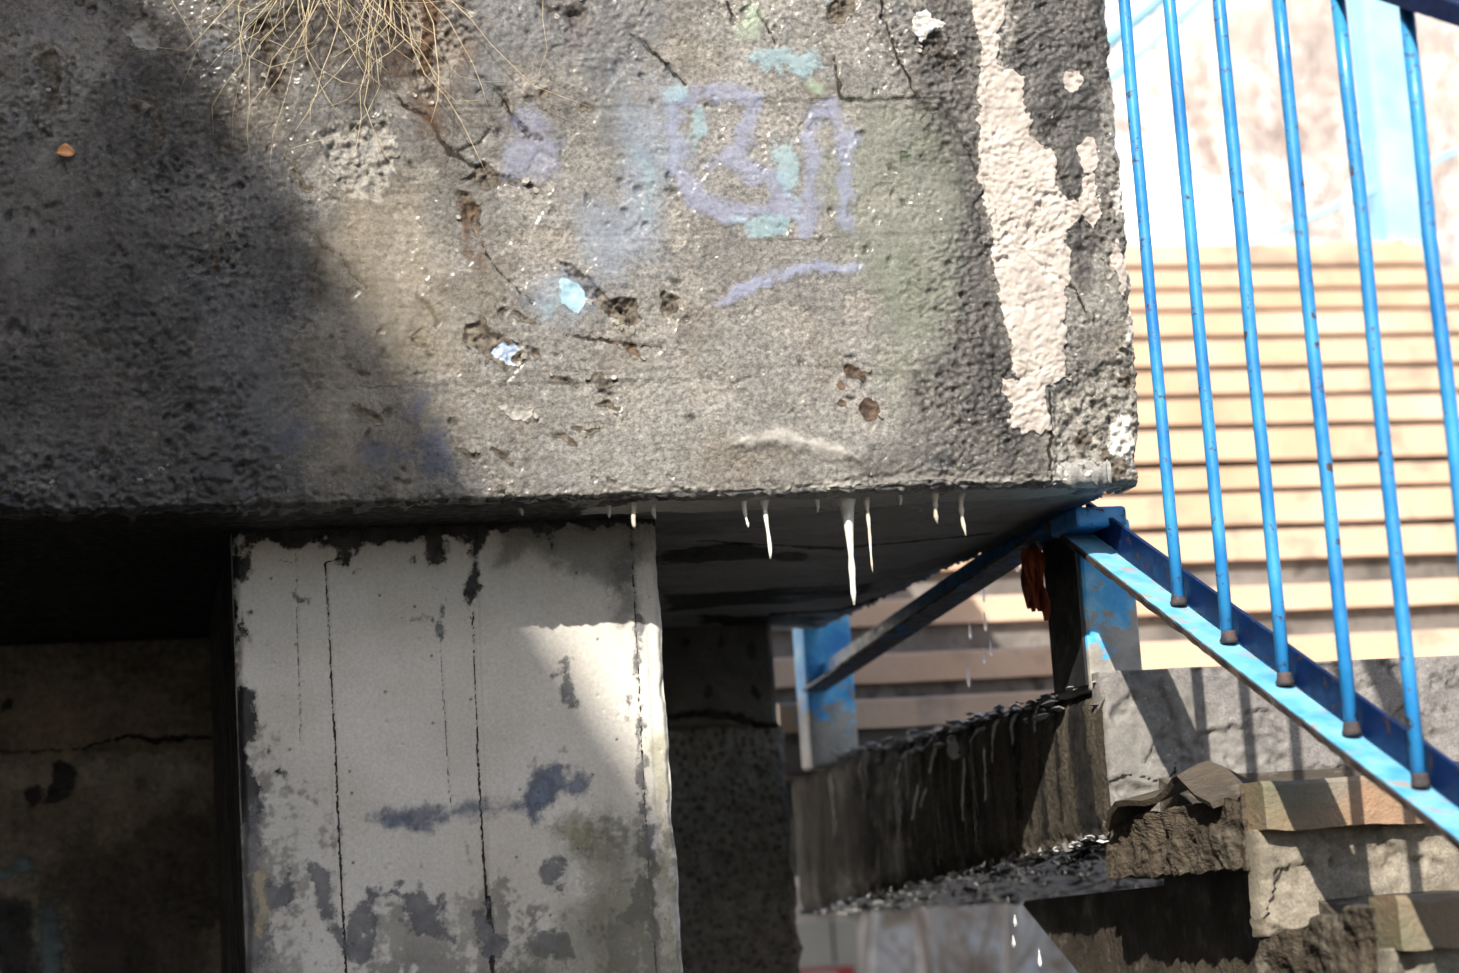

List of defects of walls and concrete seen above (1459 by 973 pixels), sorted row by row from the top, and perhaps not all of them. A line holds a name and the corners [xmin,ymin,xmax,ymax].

crack [397,76,529,168]
spalling [454,160,539,238]
crack [630,0,990,241]
crack [309,297,760,390]
spalling [558,262,646,361]
crack [1068,285,1087,313]
water stain [1107,407,1135,459]
water stain [231,463,1105,645]
water stain [236,663,286,824]
peeling [241,797,456,973]
peeling [615,696,663,943]
water stain [814,694,1108,914]